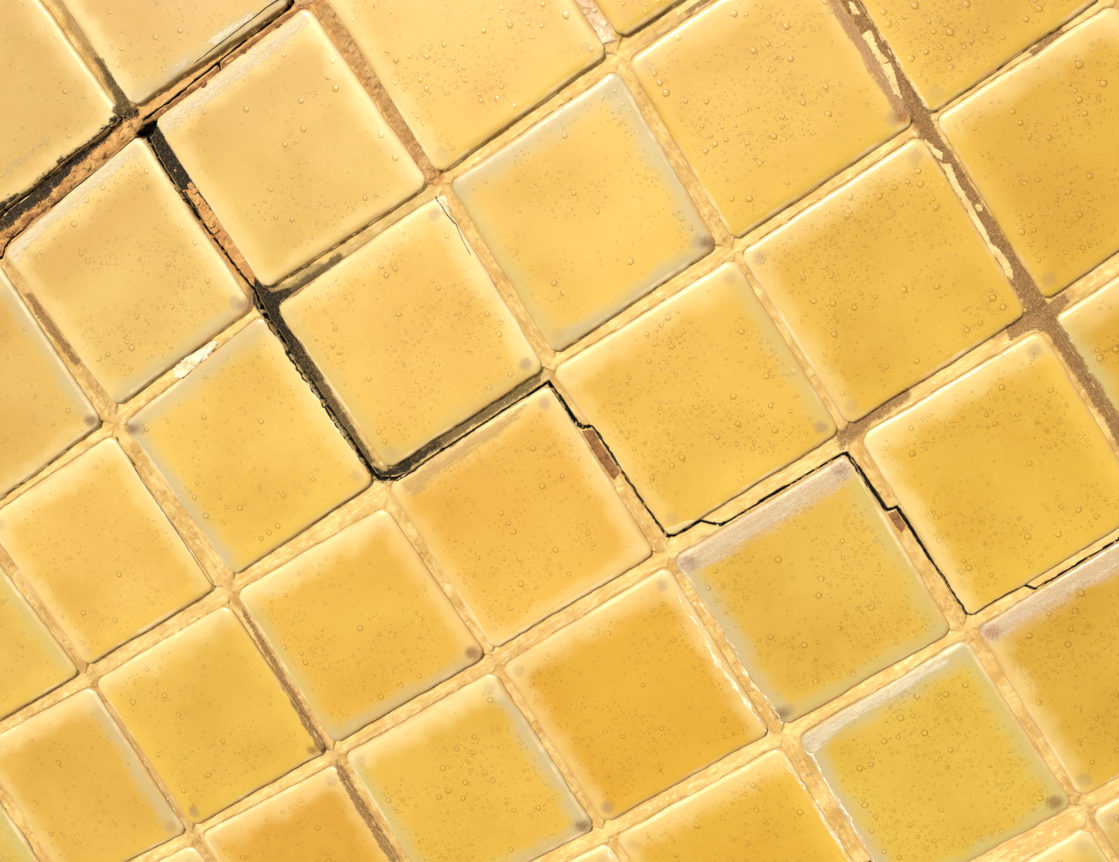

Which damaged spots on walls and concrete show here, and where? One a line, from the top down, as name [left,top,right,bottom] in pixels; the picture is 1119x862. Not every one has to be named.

crack [0,0,1119,614]